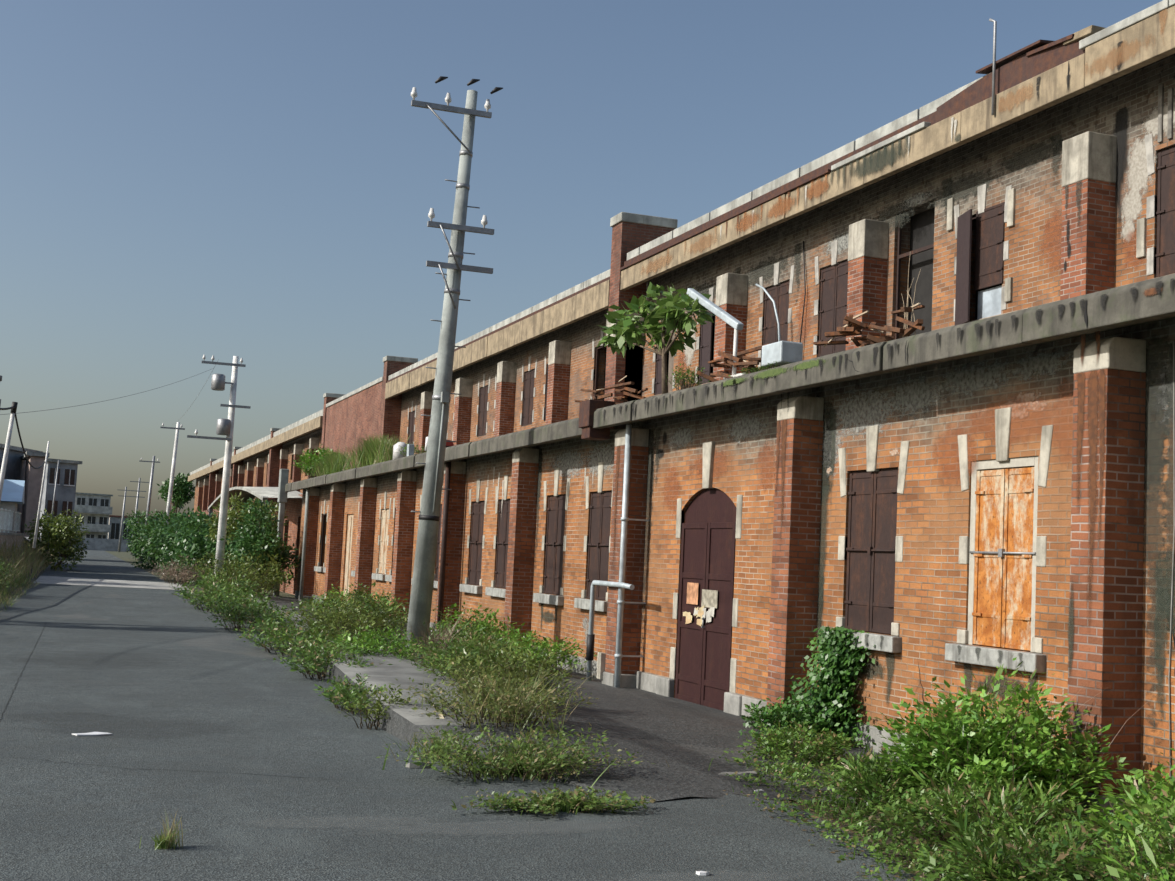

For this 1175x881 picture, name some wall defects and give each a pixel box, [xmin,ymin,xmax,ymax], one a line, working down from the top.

damp [1156,278,1174,296]
damp [1058,299,1085,318]
damp [1143,336,1175,727]